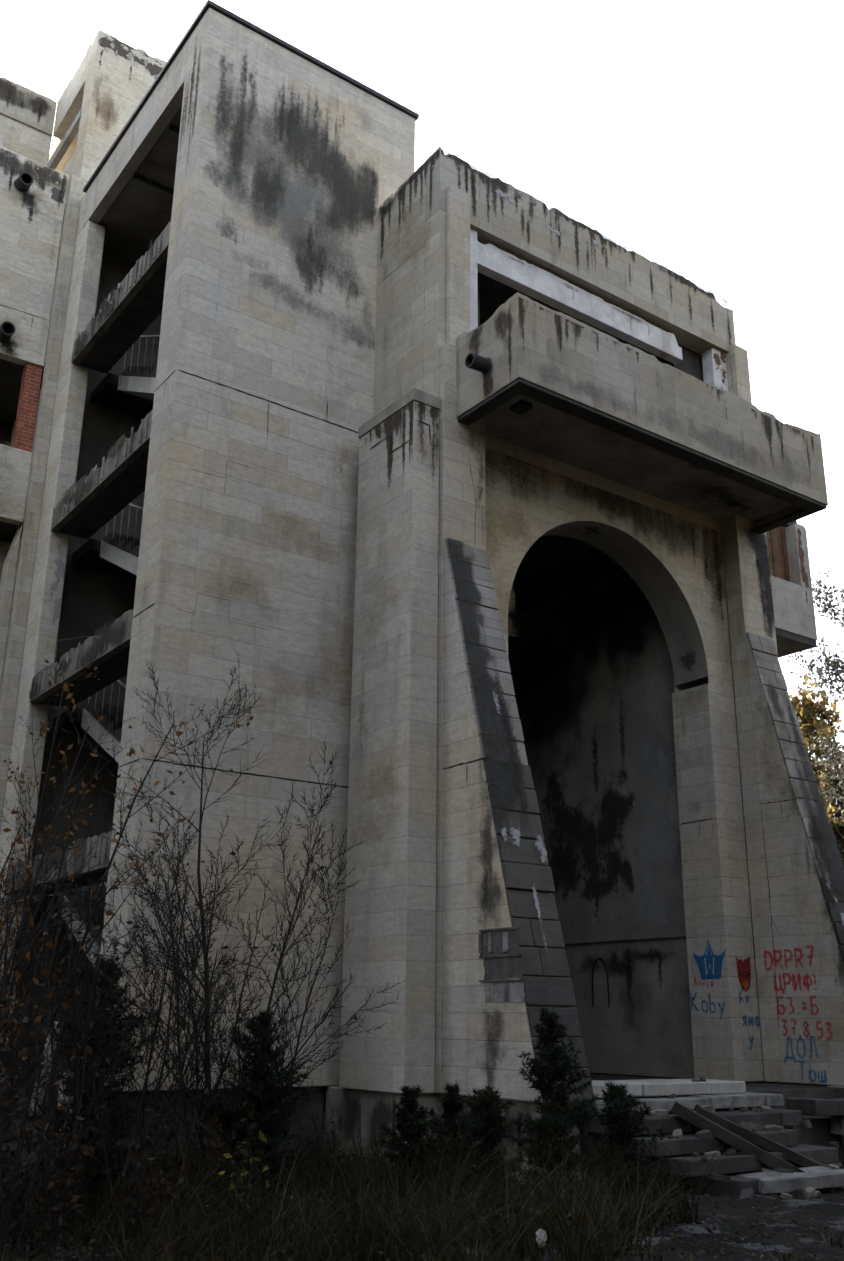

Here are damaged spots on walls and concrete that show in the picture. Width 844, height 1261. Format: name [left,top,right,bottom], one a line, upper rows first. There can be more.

damp [0,78,49,120]
damp [215,56,635,295]
damp [468,296,639,372]
damp [650,265,732,344]
damp [483,364,493,397]
damp [370,402,439,480]
damp [751,409,814,474]
damp [493,675,529,820]
damp [480,809,500,913]
damp [583,950,663,1010]
damp [485,1013,501,1085]